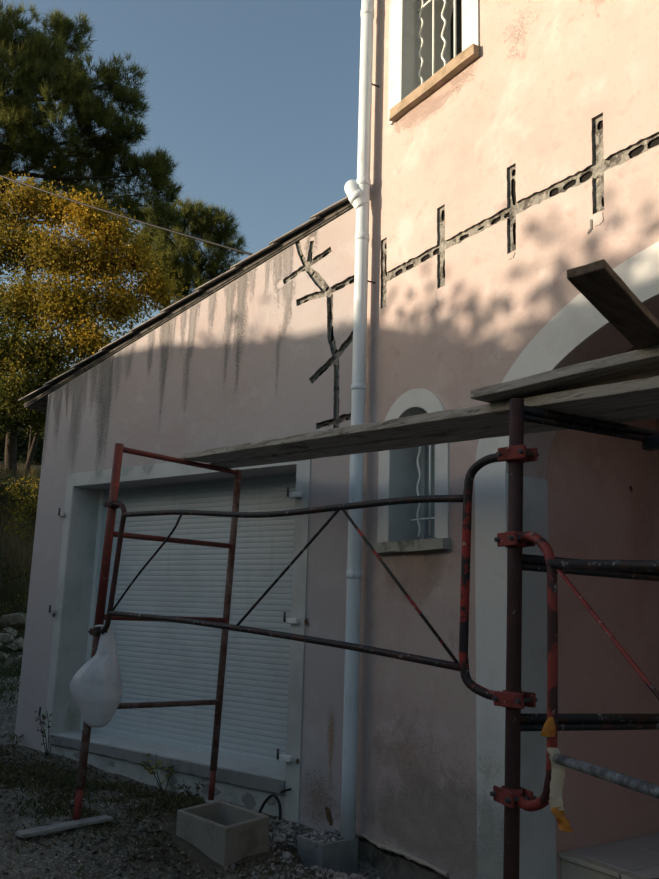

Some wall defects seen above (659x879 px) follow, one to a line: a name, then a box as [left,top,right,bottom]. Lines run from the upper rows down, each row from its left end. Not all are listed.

peeling [587,212,604,234]
leakage [146,230,318,430]
leakage [41,342,136,485]